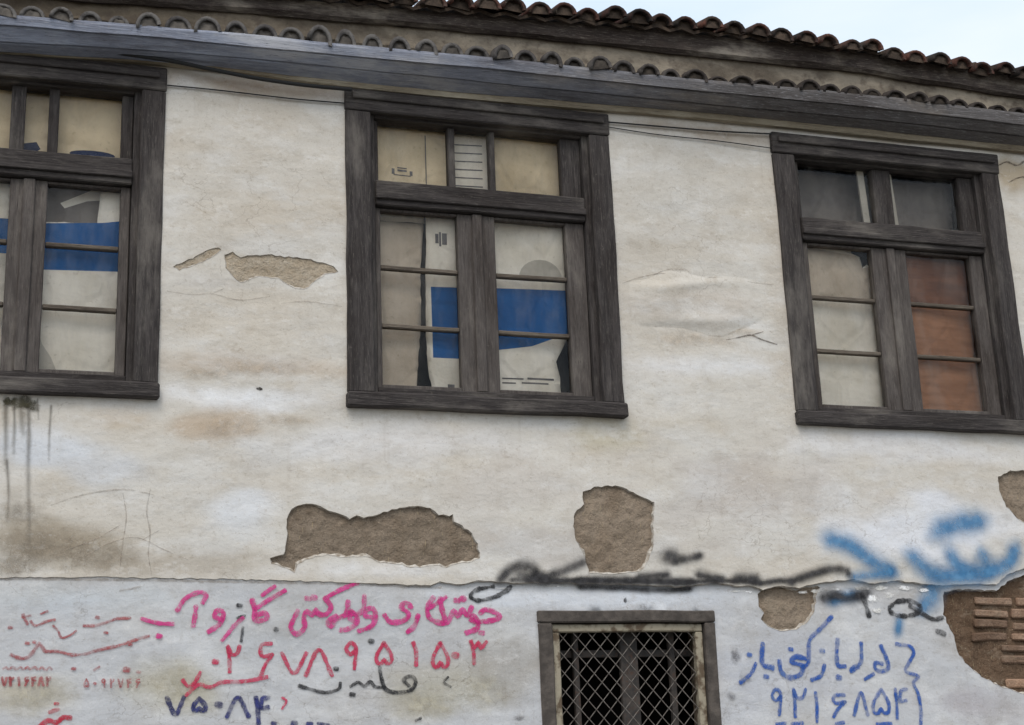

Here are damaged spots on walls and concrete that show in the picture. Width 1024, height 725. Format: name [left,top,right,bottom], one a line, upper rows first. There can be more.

flaking render [173,247,338,289]
damp [4,395,37,418]
flaking render [998,470,1024,522]
flaking render [270,504,480,573]
flaking render [573,485,654,575]
flaking render [731,586,820,631]
peeling [833,585,928,613]
flaking render [943,575,1024,694]